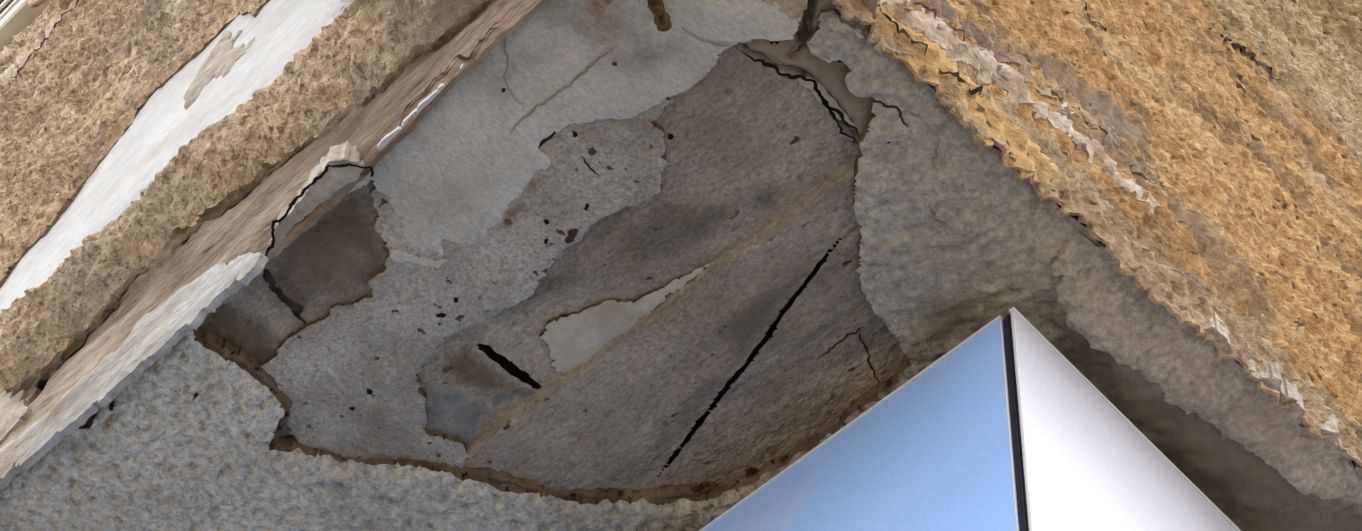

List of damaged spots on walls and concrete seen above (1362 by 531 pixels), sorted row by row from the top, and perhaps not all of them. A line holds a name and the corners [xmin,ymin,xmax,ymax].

crack [681,0,939,170]
peeling [861,0,1164,214]
crack [6,148,374,397]
spalling [0,0,907,500]